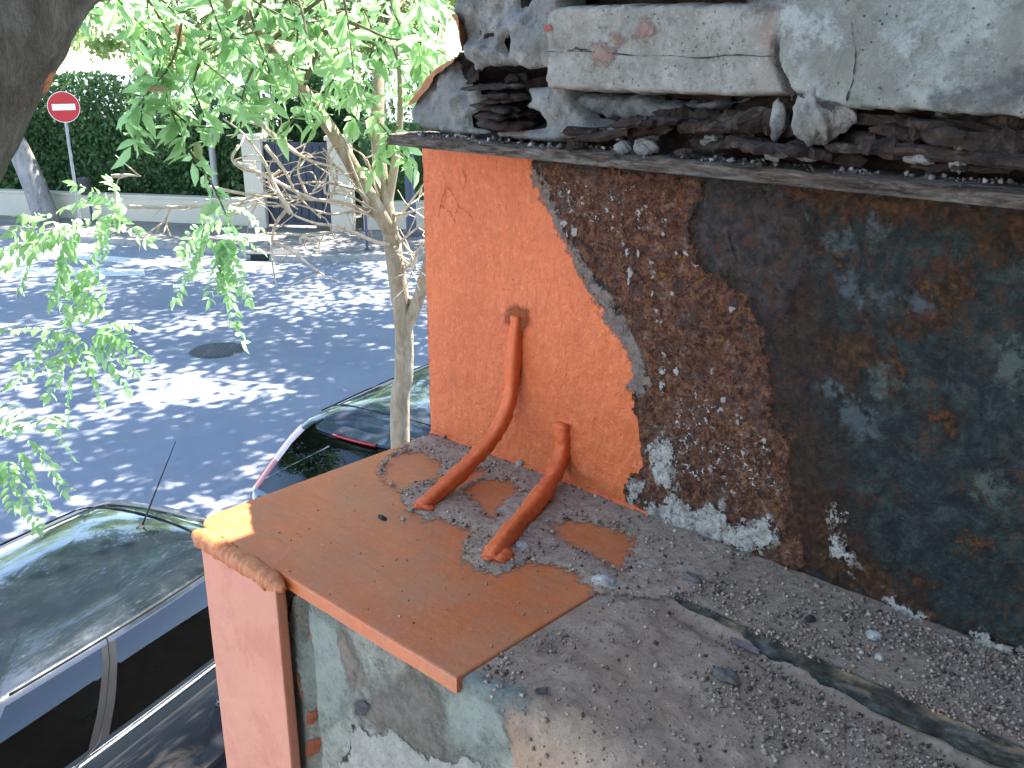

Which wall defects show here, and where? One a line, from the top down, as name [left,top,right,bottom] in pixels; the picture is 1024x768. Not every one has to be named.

spalling [480,30,511,52]
spalling [453,52,548,141]
crack [548,23,856,112]
peeling [550,181,667,285]
peeling [658,352,679,394]
rust [537,160,1024,658]
damp [626,430,781,556]